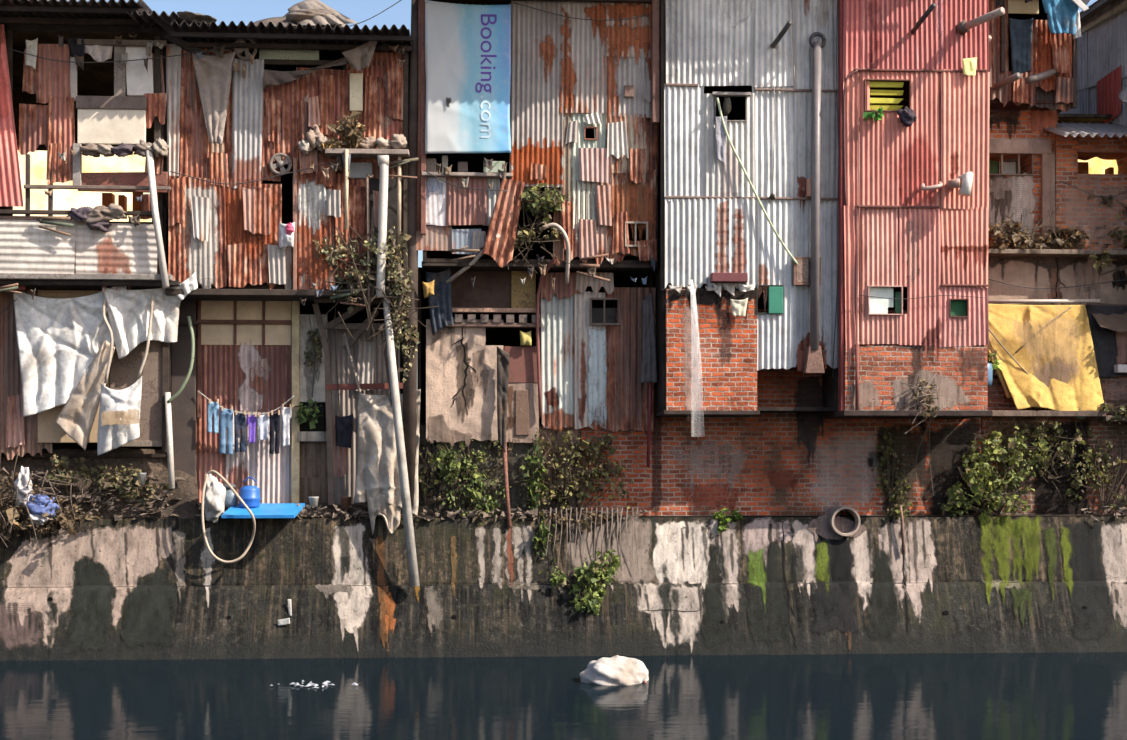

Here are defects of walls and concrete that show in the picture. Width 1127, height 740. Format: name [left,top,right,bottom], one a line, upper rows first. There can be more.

corrosion [539,9,577,117]
corrosion [584,4,660,128]
corrosion [510,138,563,186]
corrosion [225,158,275,262]
corrosion [297,222,331,290]
corrosion [609,182,655,241]
corrosion [715,201,769,306]
crack [451,327,478,415]
damp [985,420,1114,640]
damp [46,559,177,653]
damp [658,566,680,656]